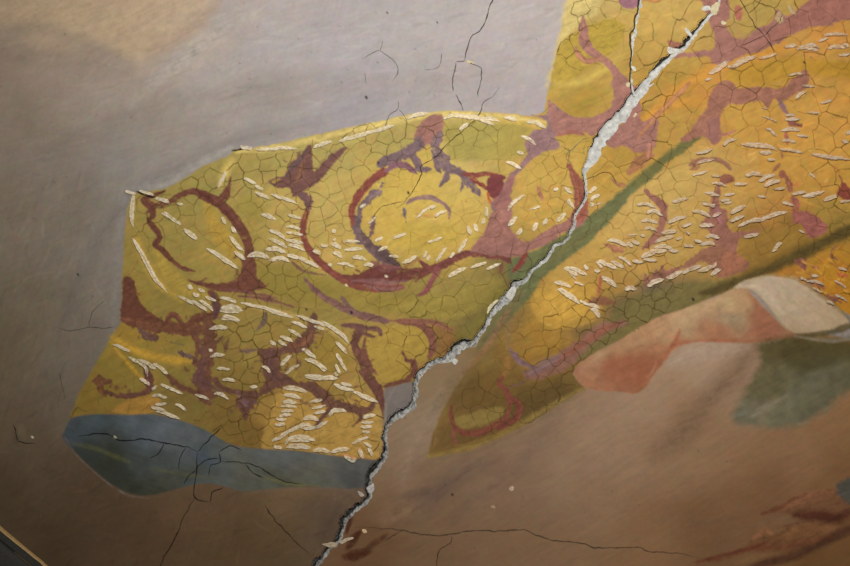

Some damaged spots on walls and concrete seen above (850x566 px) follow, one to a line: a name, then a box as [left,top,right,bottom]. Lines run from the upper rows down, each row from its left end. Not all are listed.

crack [89,430,297,501]
crack [311,0,720,566]